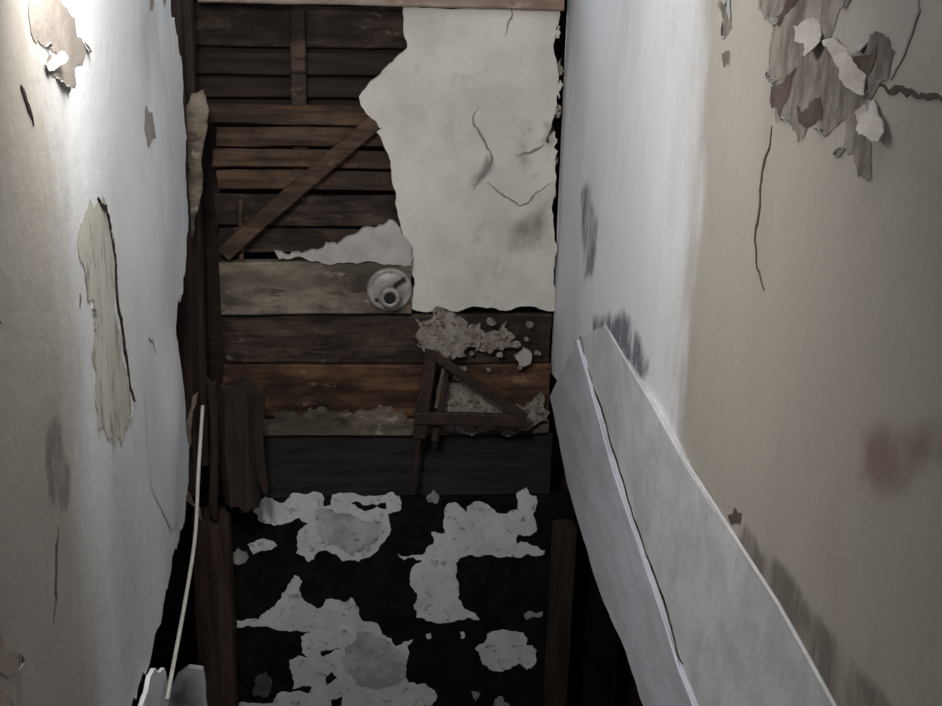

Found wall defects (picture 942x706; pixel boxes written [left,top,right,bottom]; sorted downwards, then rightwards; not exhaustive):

peeling [28,0,92,93]
peeling [717,0,732,68]
peeling [758,0,942,182]
crack [472,106,553,207]
peeling [78,196,136,452]
flaking render [415,306,550,437]
peeling [233,539,277,565]
peeling [253,492,401,562]
peeling [398,487,545,639]
peeling [237,575,437,706]
peeling [493,696,510,706]
peeling [475,629,537,672]